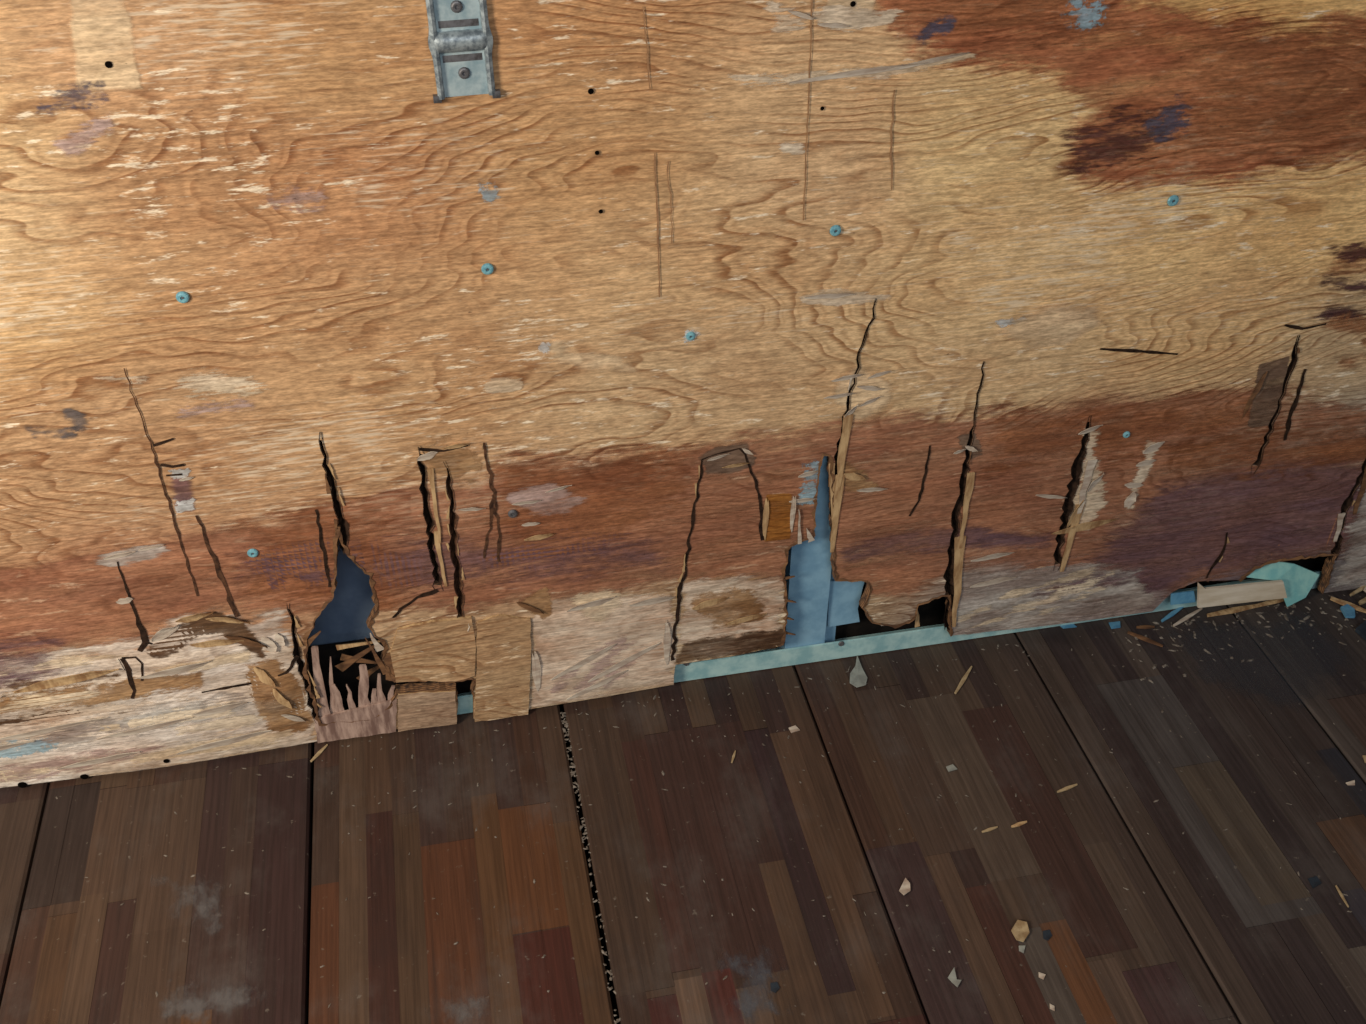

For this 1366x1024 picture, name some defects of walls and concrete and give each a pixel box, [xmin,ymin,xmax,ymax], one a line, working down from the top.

water stain [875,0,1366,191]
water stain [1314,242,1366,344]
crack [315,432,349,587]
spalling [253,525,476,743]
crack [392,443,501,618]
peeling [516,602,545,615]
water stain [0,386,1366,659]
crack [671,448,764,661]
spalling [781,453,953,645]
crack [943,362,985,630]
crack [1053,418,1097,572]
hole [1239,553,1339,594]